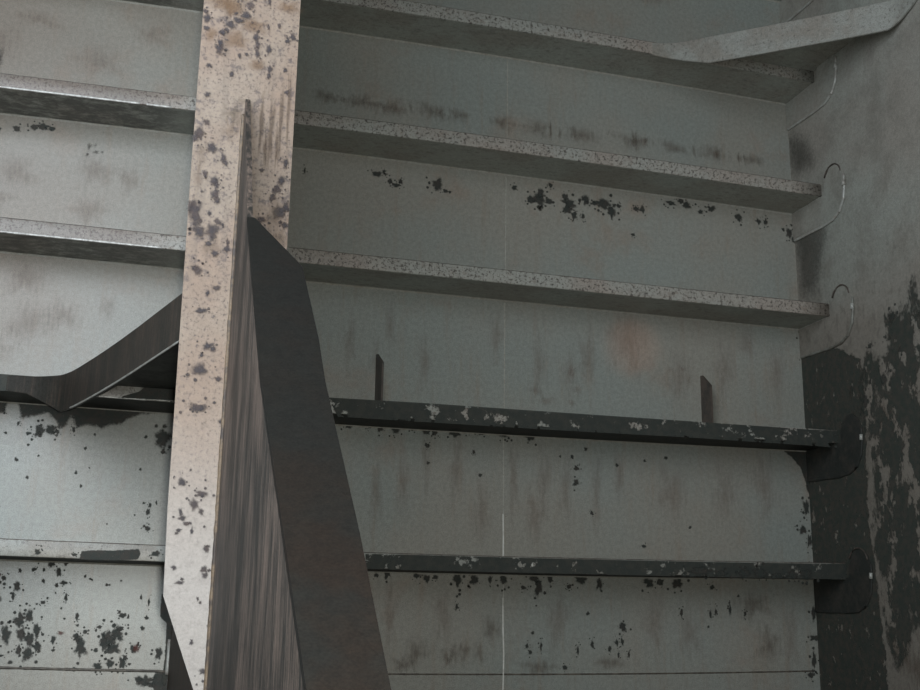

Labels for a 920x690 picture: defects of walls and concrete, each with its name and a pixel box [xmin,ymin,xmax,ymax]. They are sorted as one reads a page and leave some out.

peeling [850,280,920,668]